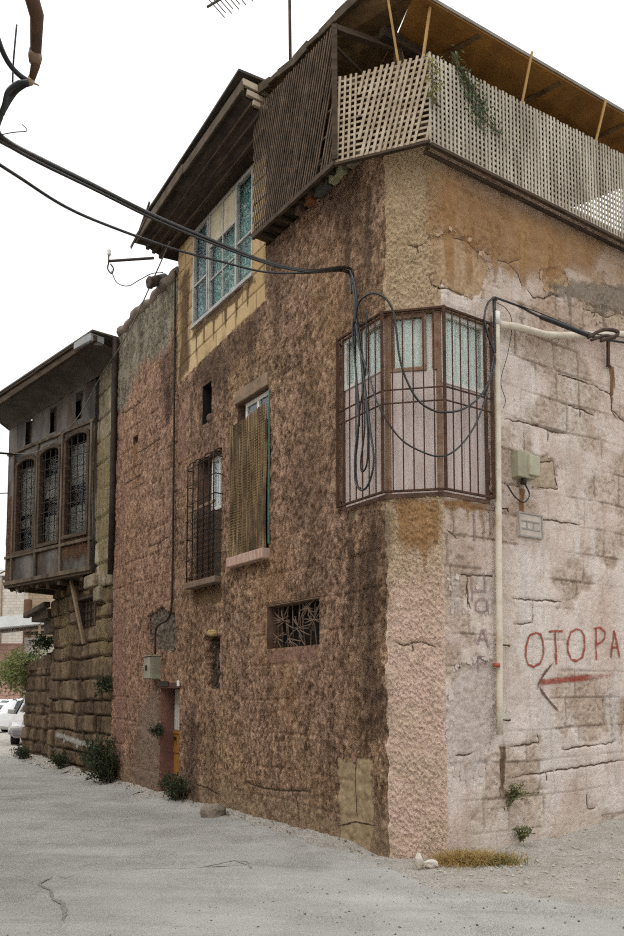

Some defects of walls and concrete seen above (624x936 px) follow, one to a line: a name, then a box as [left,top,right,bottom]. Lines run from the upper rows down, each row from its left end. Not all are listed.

peeling [428,226,491,299]
crack [185,860,257,877]
crack [38,875,71,921]